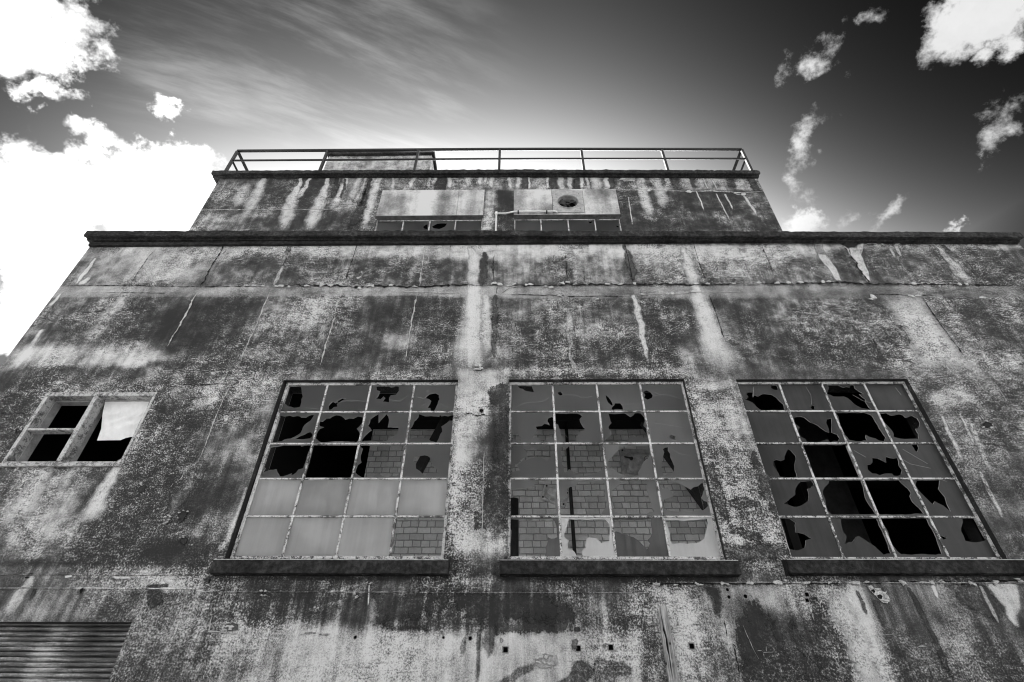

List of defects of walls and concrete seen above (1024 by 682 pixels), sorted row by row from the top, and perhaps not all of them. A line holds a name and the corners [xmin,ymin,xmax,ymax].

damp [233,178,266,212]
damp [280,178,395,229]
damp [409,177,531,190]
damp [546,178,615,189]
damp [628,178,761,222]
crack [71,252,153,293]
damp [454,247,499,368]
damp [631,295,649,358]
crack [168,244,1024,486]
damp [473,382,513,533]
damp [368,589,632,682]
damp [734,590,886,682]